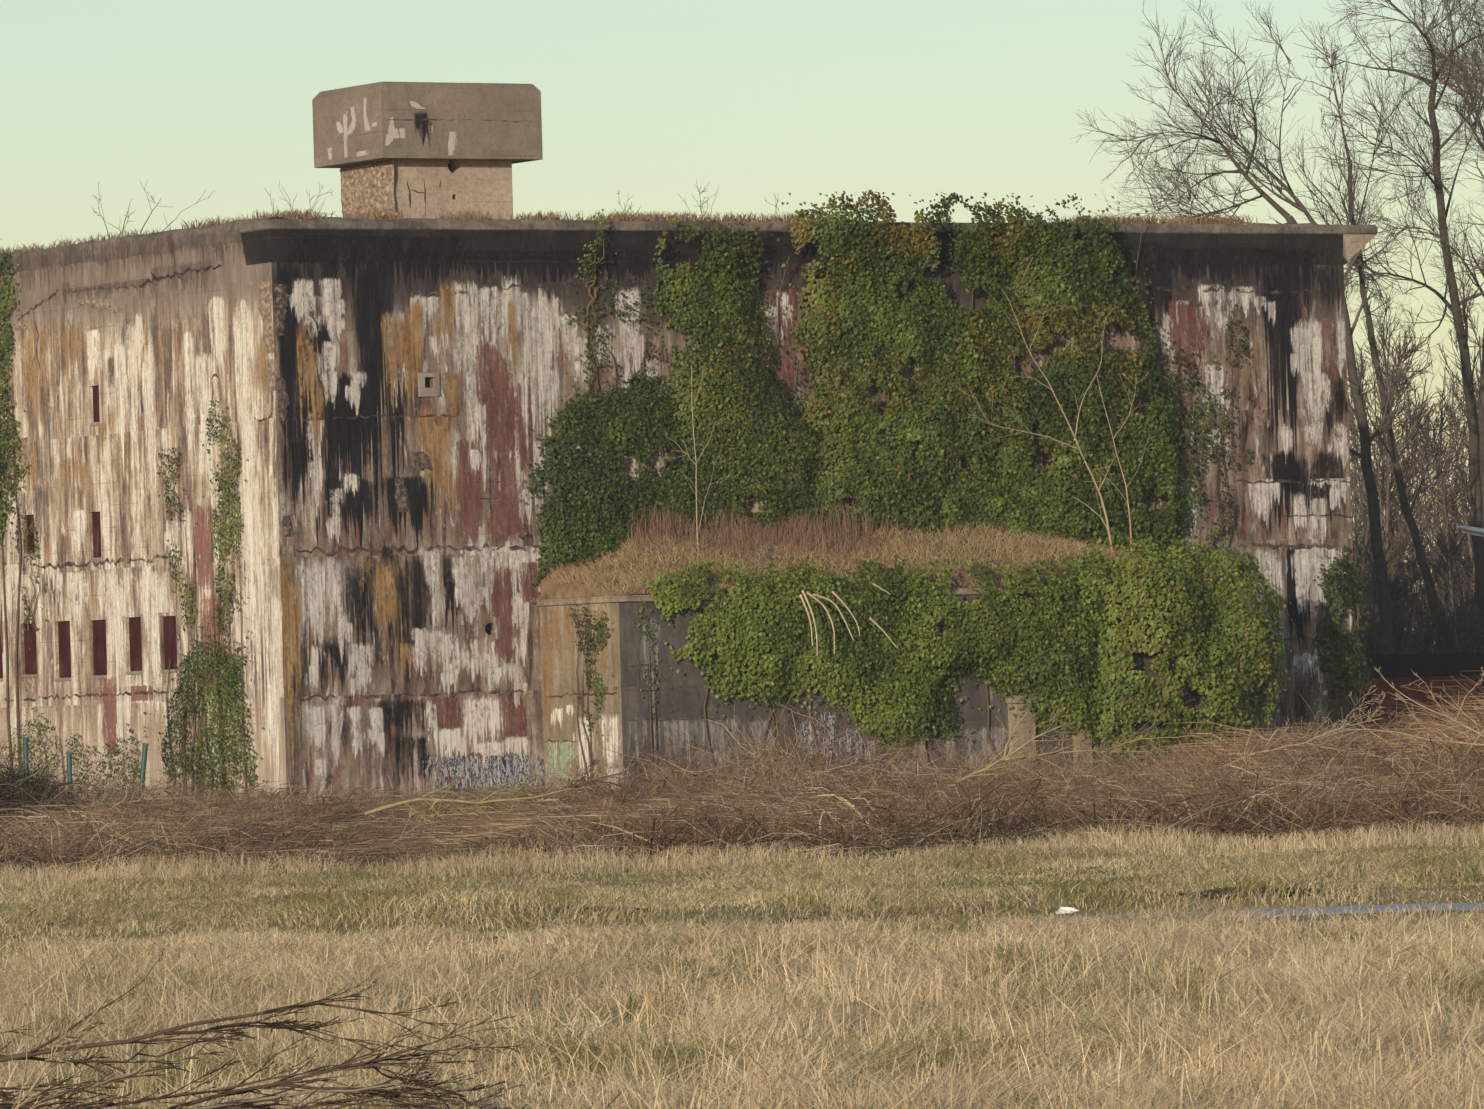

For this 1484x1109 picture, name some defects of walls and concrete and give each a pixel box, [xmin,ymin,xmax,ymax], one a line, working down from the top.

spalling [258,281,290,421]
peeling [1169,301,1208,375]
peeling [1321,320,1337,383]
water stain [2,390,53,617]
spalling [282,516,294,537]
spalling [394,451,432,512]
water stain [15,229,812,793]
peeling [456,344,535,544]